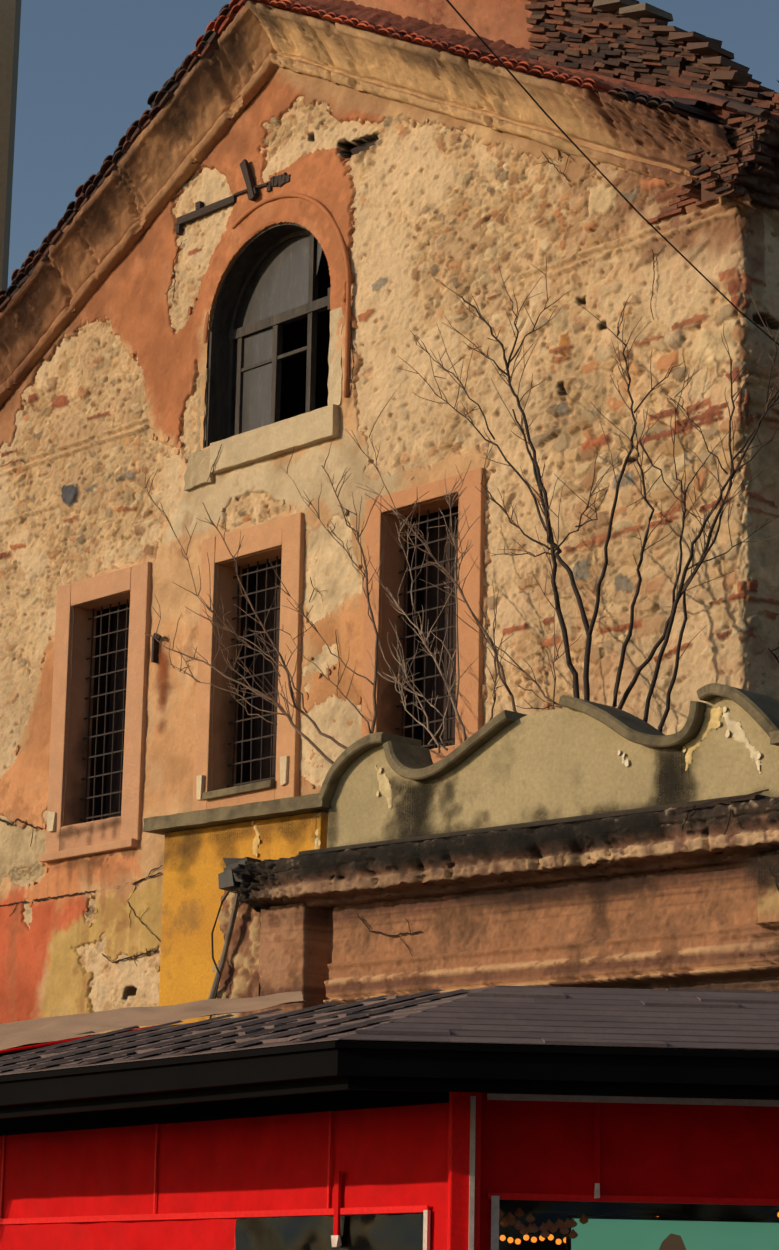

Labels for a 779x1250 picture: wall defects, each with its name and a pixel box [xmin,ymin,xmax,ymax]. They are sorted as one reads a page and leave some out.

spalling [168,167,235,334]
spalling [260,96,779,789]
spalling [0,316,200,778]
crack [0,818,42,847]
spalling [0,814,48,929]
crack [0,865,163,967]
spalling [73,894,161,1012]
peeling [375,766,393,809]
crack [357,913,422,955]
water stain [390,781,452,840]
water stain [642,747,693,808]
water stain [748,850,779,887]